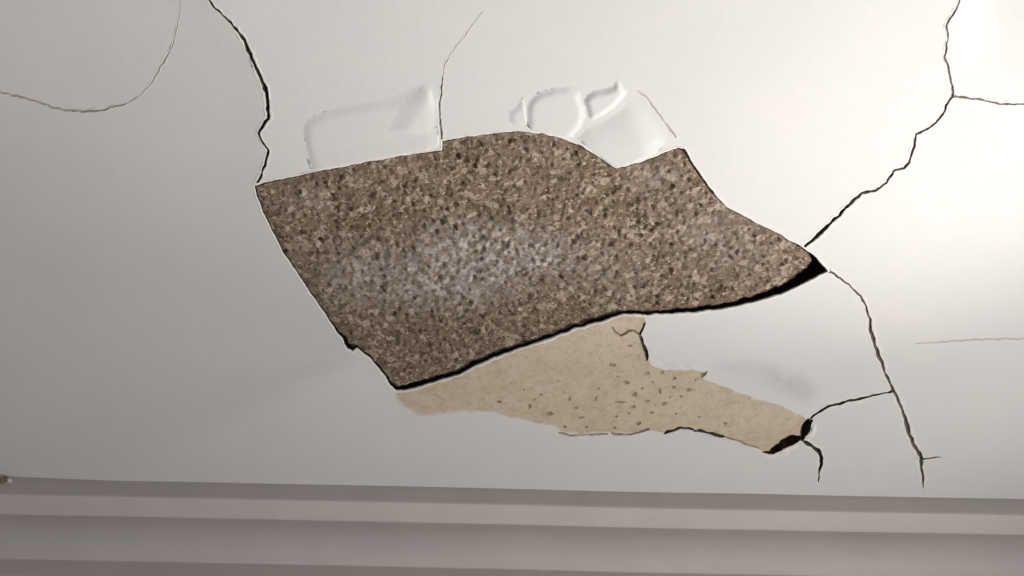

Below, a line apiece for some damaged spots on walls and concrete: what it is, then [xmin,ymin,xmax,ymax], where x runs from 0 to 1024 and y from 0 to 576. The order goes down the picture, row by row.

crack [0,0,181,114]
crack [207,0,274,183]
crack [437,11,483,147]
crack [802,0,1024,249]
spalling [252,79,830,460]
crack [802,269,943,489]